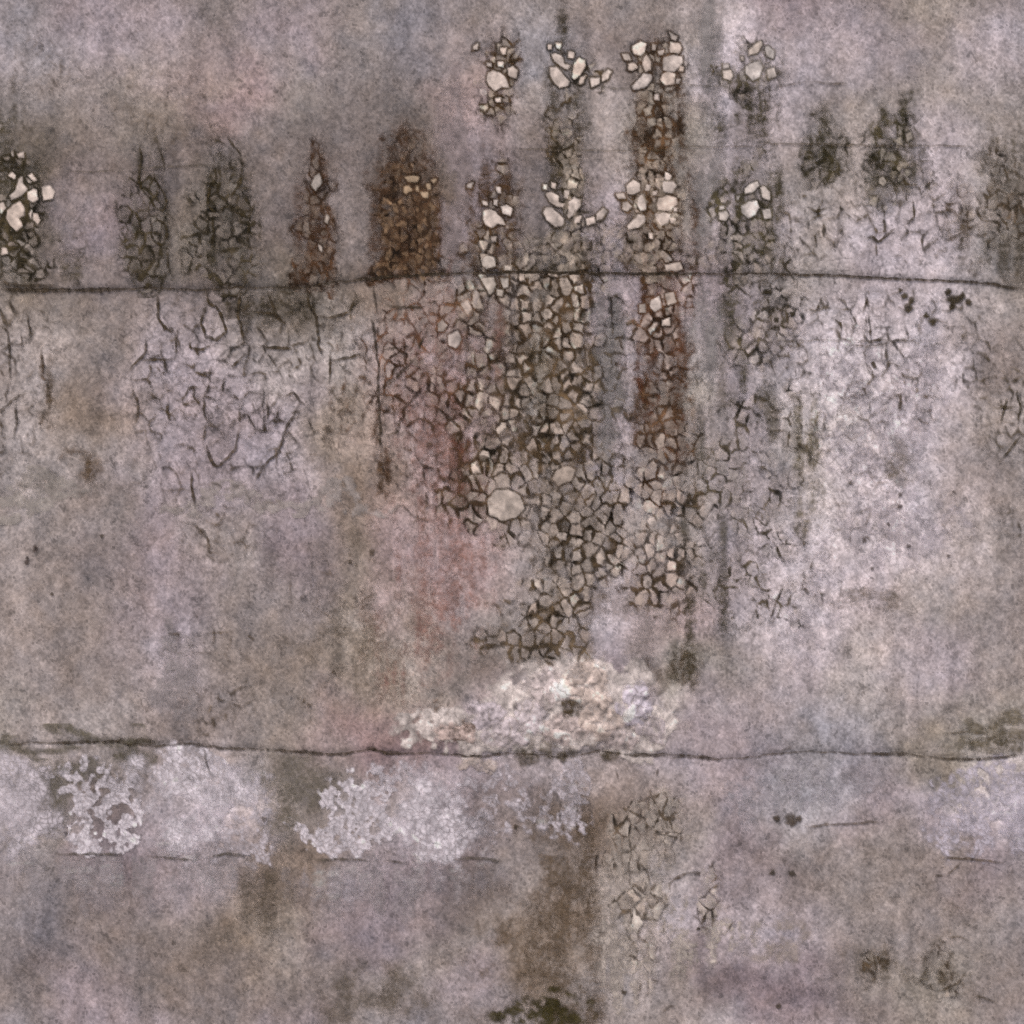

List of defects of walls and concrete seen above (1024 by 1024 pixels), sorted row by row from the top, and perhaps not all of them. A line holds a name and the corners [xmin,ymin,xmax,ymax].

peeling [0,151,55,282]
corrosion [367,160,441,286]
crack [0,140,1024,523]
peeling [361,30,805,668]
crack [8,690,1015,776]
leakage [0,723,590,911]
peeling [610,792,679,870]
peeling [613,884,661,987]
peeling [696,863,718,930]